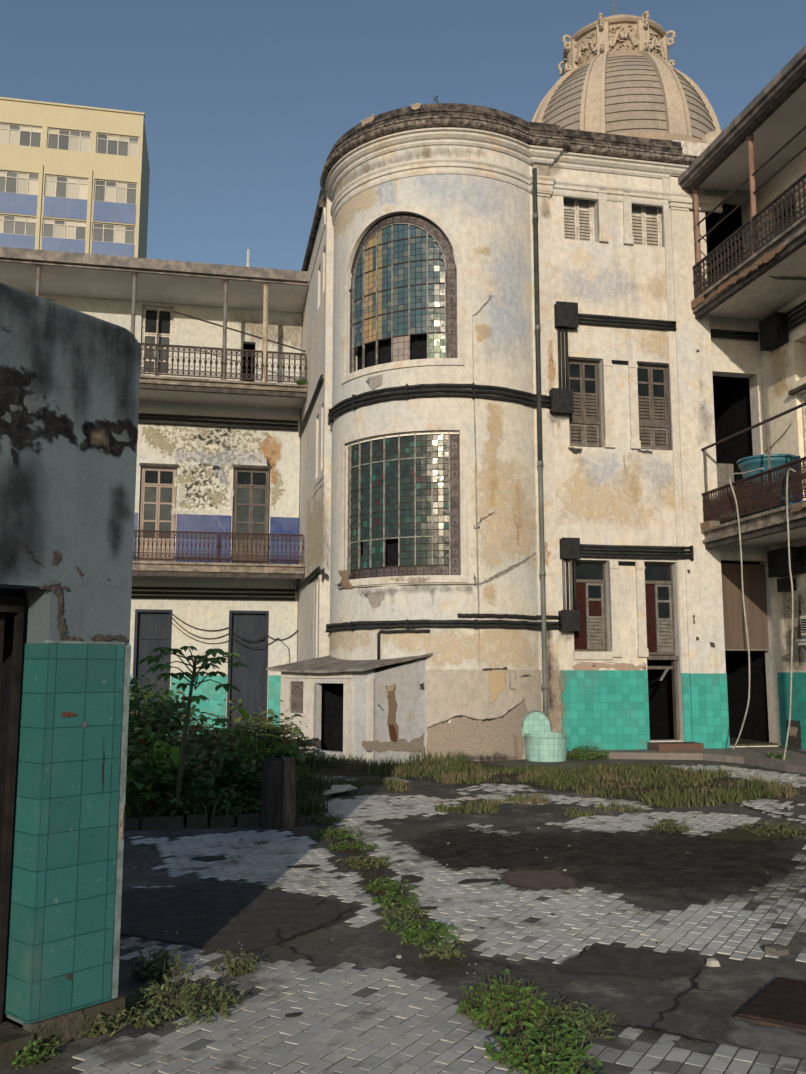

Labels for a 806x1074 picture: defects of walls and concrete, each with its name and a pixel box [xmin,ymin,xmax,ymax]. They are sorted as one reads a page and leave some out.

damp [0,364,138,569]
peeling [142,420,285,515]
damp [476,404,535,566]
peeling [385,684,399,742]
flaking render [426,699,528,761]
peeling [483,667,508,703]
crack [607,969,722,1045]